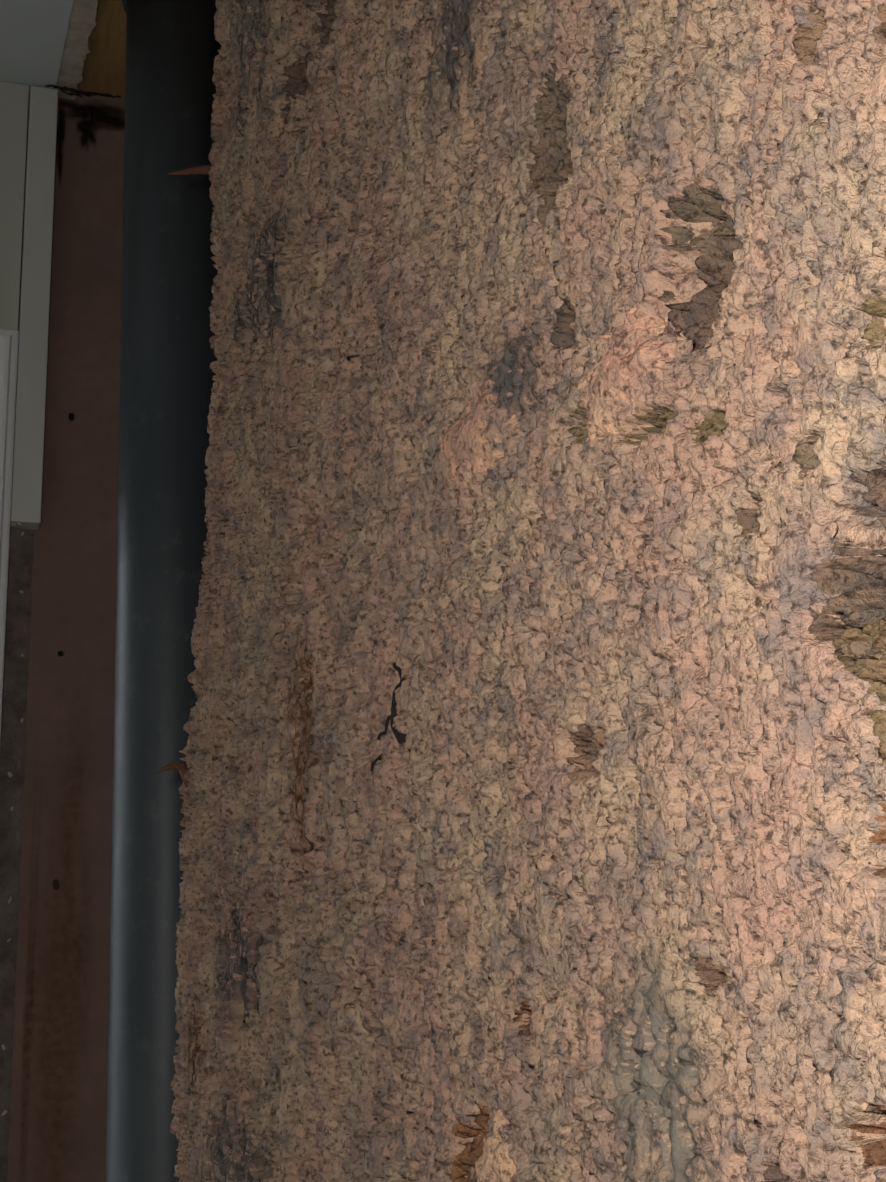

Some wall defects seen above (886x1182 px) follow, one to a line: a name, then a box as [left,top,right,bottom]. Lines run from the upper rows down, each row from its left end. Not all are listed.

crack [370,662,411,772]